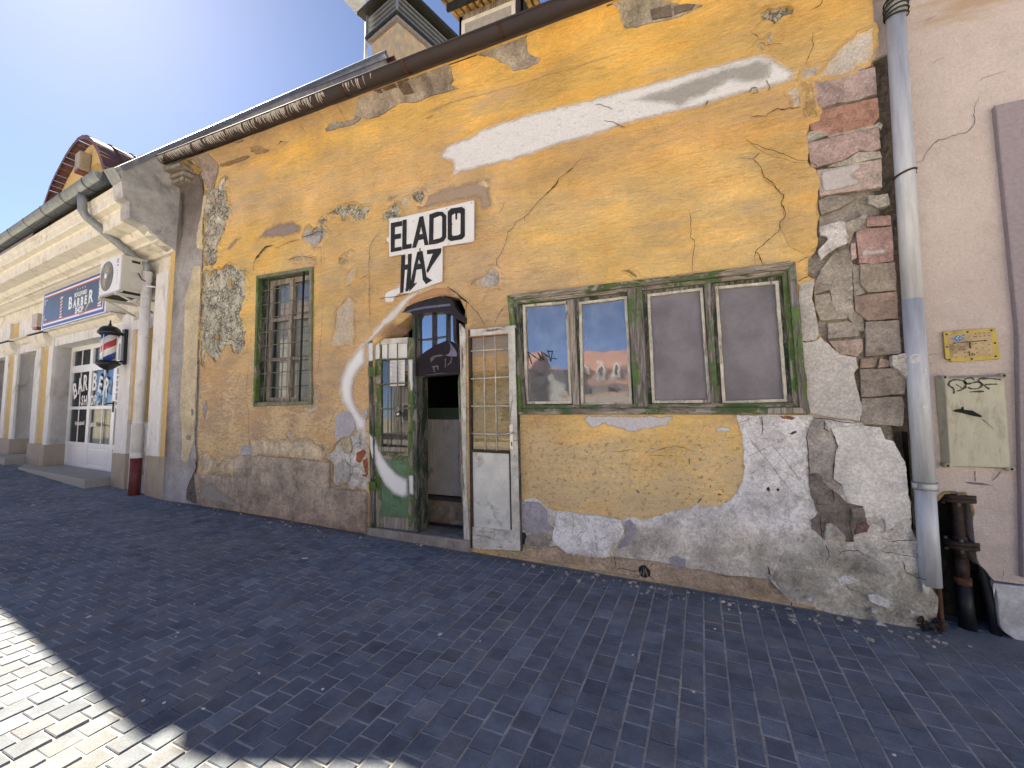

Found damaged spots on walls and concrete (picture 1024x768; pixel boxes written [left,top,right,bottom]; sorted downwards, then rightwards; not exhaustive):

spalling [325,36,540,131]
spalling [607,0,702,29]
spalling [286,186,430,264]
crack [448,153,584,325]
crack [740,107,817,265]
spalling [180,145,370,504]
flaking render [522,22,975,629]
spalling [968,558,988,622]